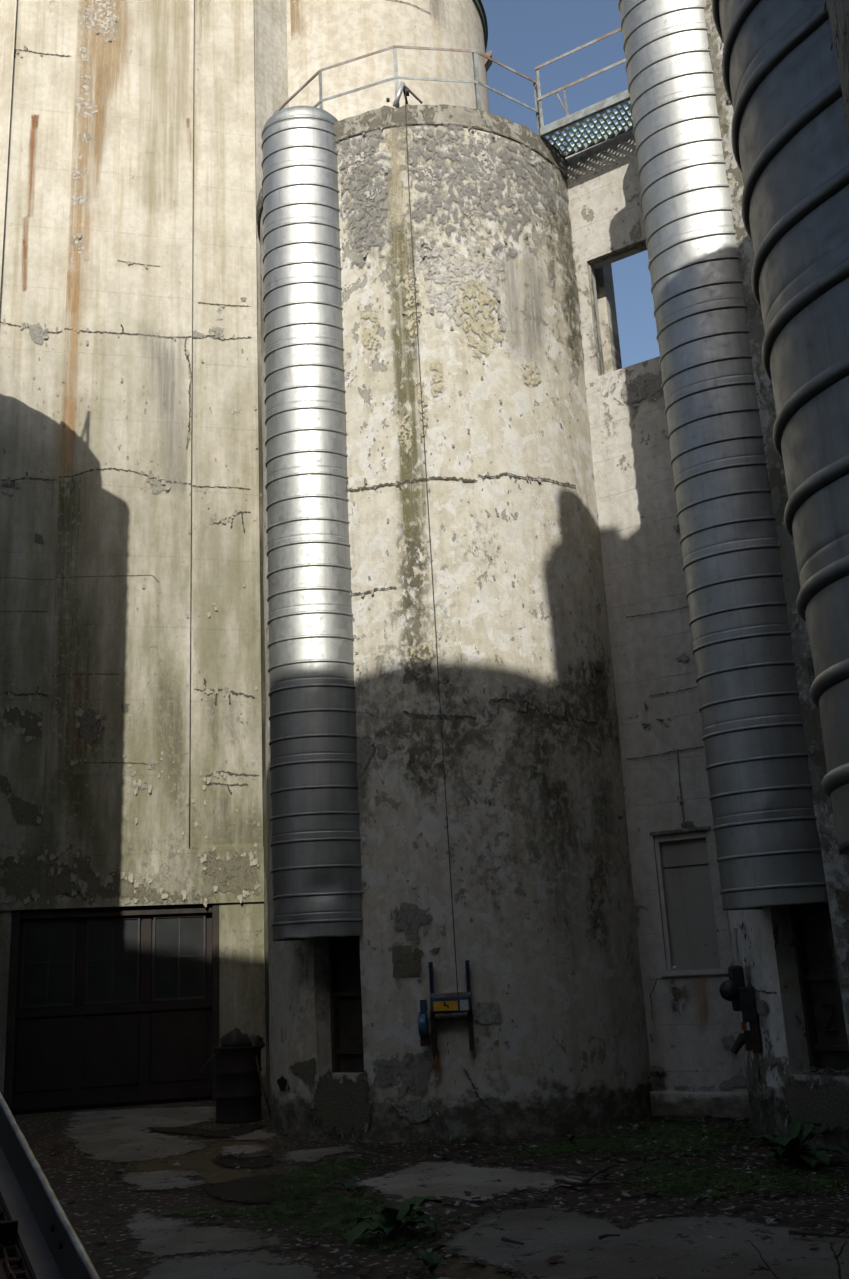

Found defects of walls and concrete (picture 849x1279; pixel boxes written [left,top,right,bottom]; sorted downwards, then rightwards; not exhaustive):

peeling [80,0,122,43]
rust [29,115,38,198]
rust [60,0,127,471]
crack [0,302,252,449]
damp [396,330,413,400]
crack [0,467,251,533]
damp [400,429,422,606]
crack [346,472,576,491]
damp [409,645,454,695]
peeling [367,865,440,1007]
spalling [277,1054,374,1142]